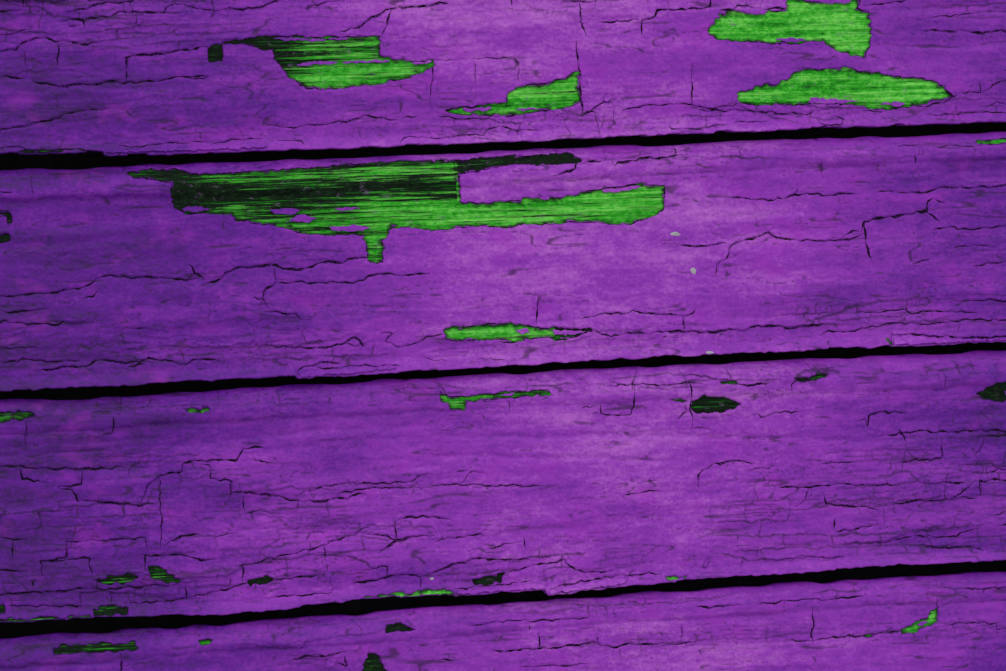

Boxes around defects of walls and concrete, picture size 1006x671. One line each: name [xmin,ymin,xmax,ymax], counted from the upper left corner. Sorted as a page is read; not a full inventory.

crack [0,0,279,88]
peeling [208,35,435,90]
peeling [444,71,580,116]
crack [556,0,1006,176]
peeling [708,0,954,110]
peeling [127,152,666,264]
crack [676,161,1006,273]
crack [0,256,446,372]
peeling [443,322,592,343]
crack [582,298,1006,343]
peeling [672,395,740,414]
crack [697,411,1006,551]